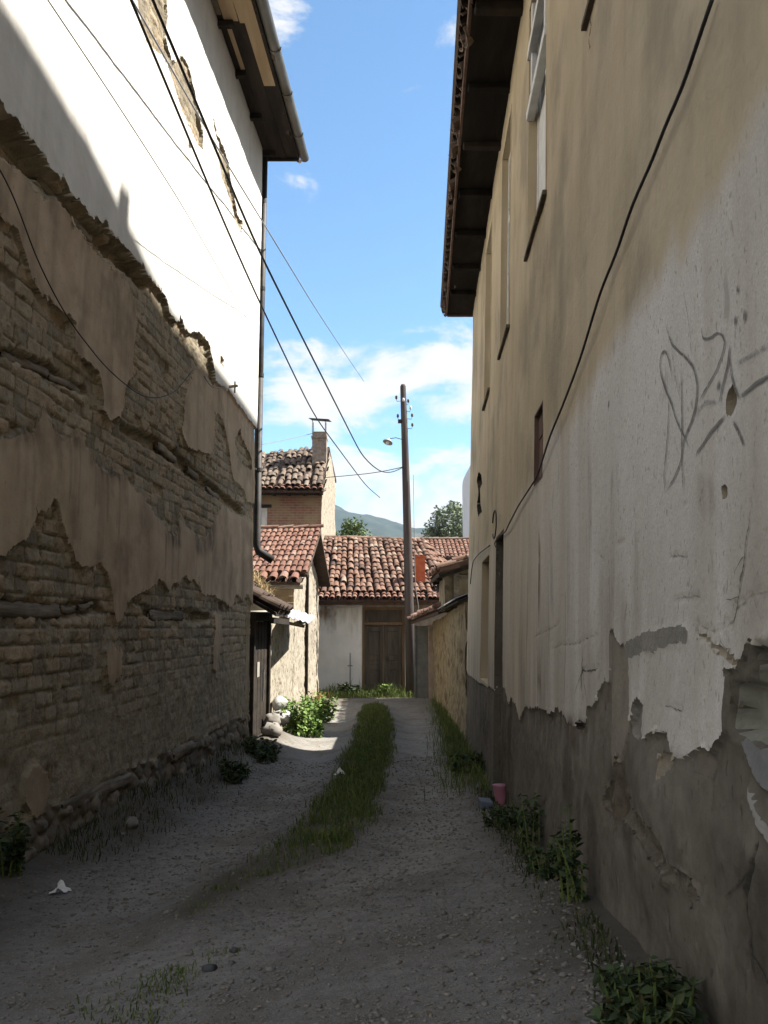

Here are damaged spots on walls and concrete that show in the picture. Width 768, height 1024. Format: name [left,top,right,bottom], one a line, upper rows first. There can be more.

spalling [137,0,243,233]
spalling [0,99,257,541]
spalling [0,498,252,833]
peeling [466,633,768,1024]